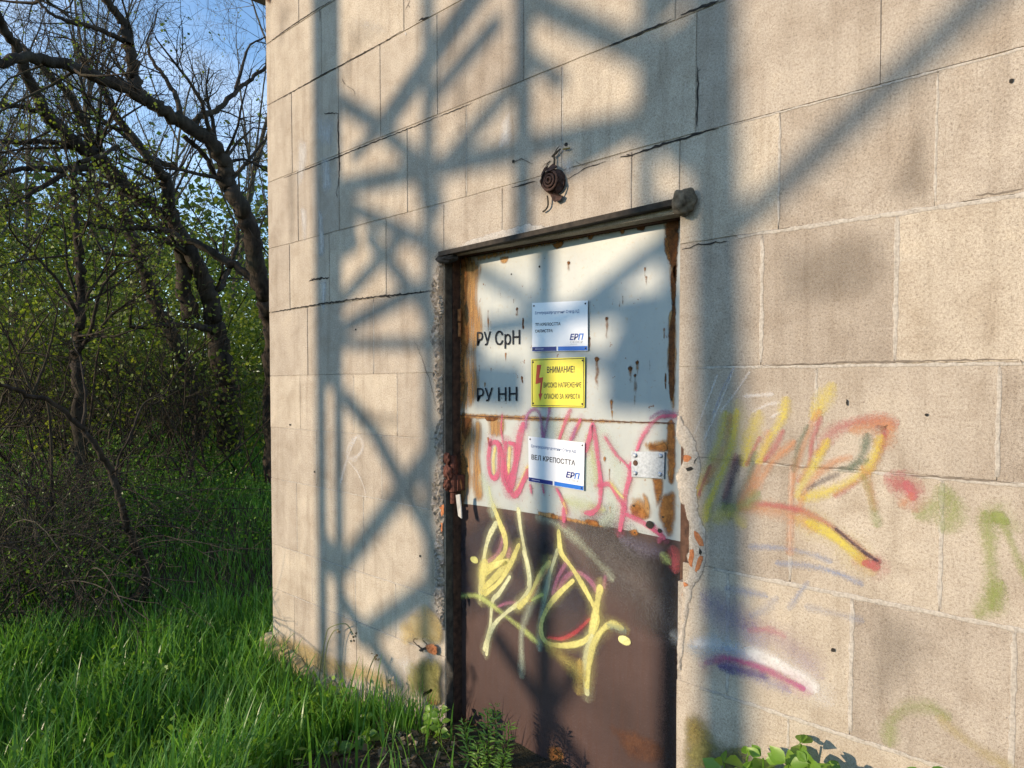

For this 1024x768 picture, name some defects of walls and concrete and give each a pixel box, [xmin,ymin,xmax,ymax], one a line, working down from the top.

crack [512,158,549,188]
crack [568,67,719,179]
spalling [430,263,462,630]
rust [460,226,645,504]
rust [623,220,680,535]
spalling [676,416,706,670]